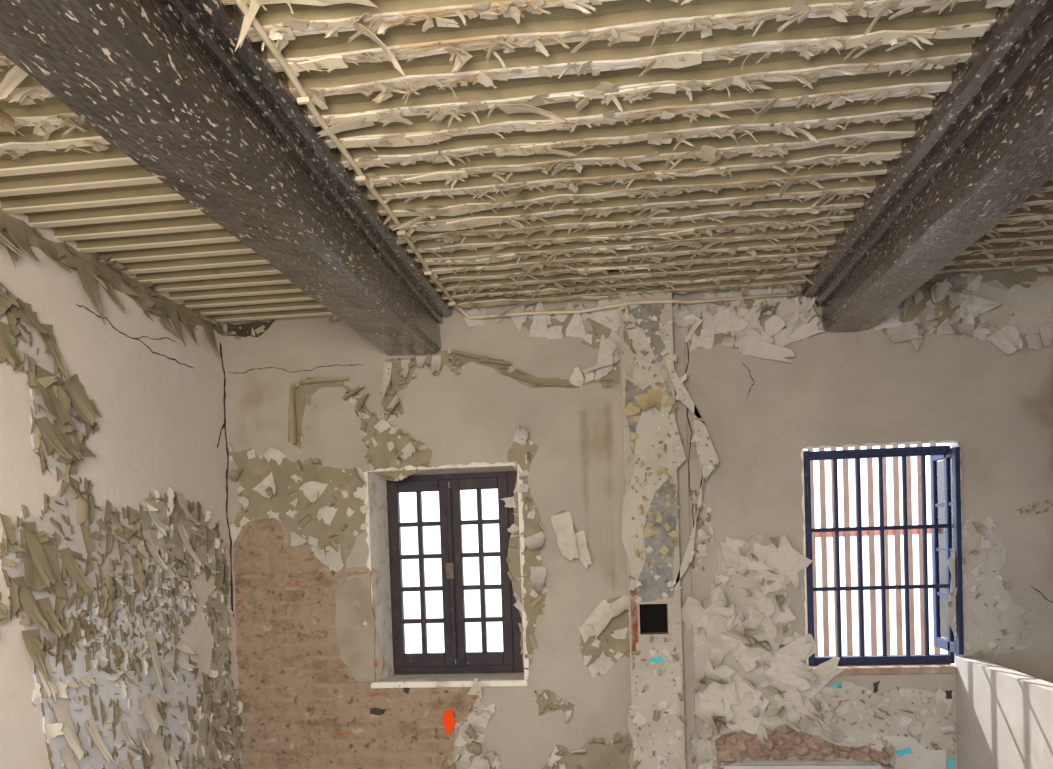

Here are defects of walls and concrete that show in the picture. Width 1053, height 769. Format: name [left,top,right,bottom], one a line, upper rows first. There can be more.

peeling [977,0,1015,8]
peeling [0,58,109,160]
crack [77,305,193,368]
peeling [0,208,275,359]
peeling [235,0,990,769]
peeling [873,178,1053,355]
crack [217,342,363,617]